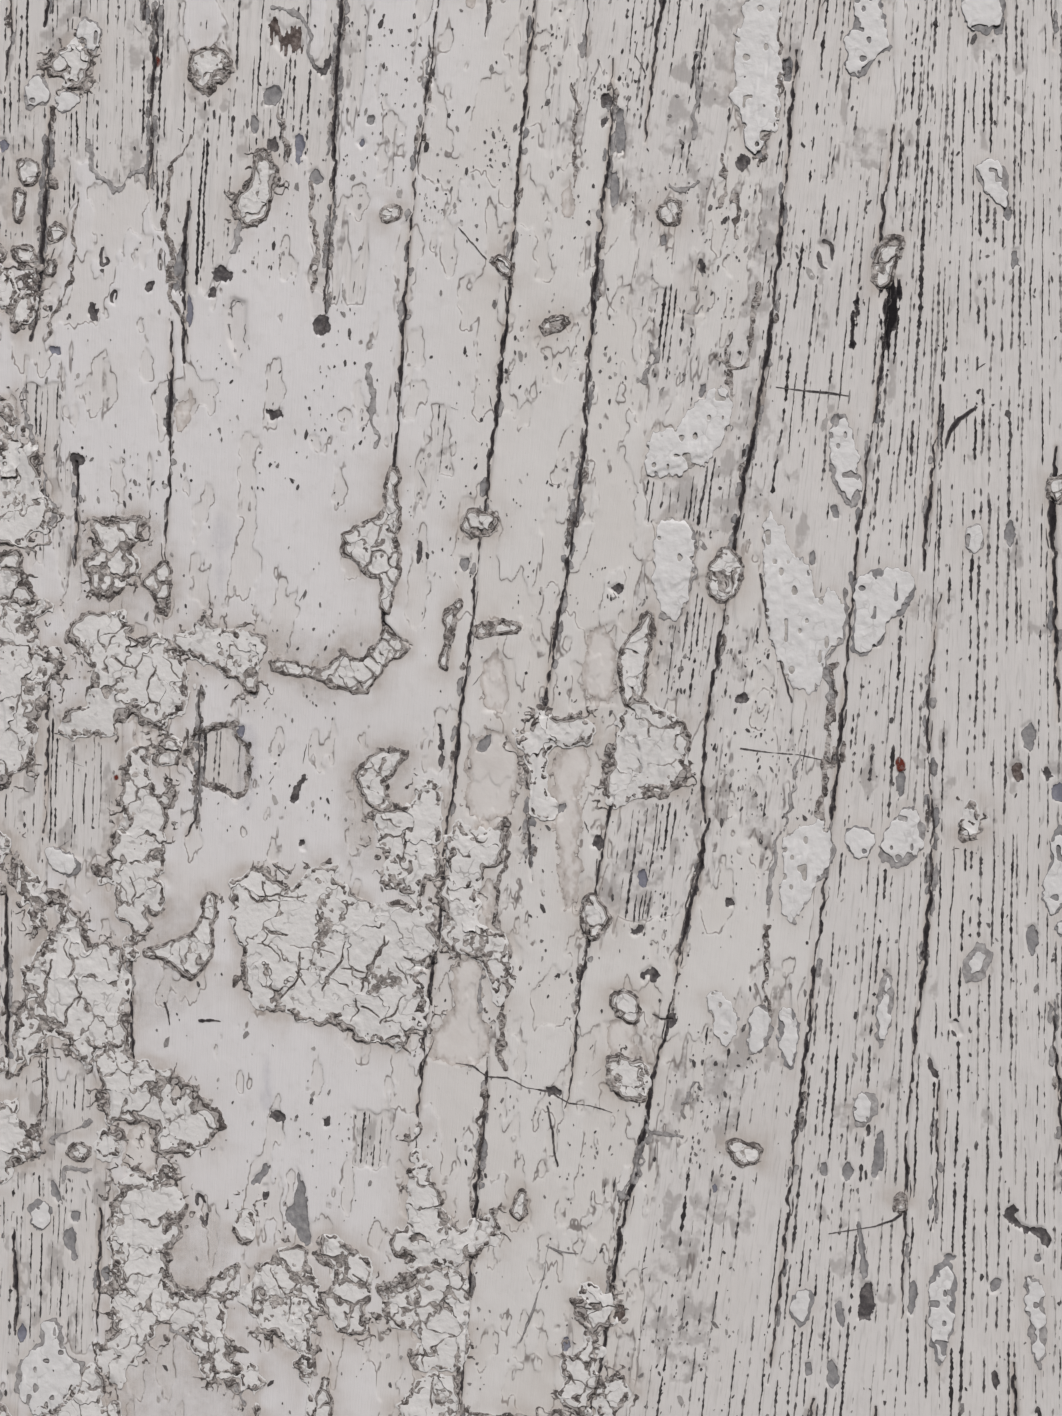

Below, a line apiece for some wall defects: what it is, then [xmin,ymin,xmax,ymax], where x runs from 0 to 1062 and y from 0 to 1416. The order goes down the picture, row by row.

peeling [24,16,103,113]
peeling [729,0,793,172]
peeling [0,139,59,224]
peeling [0,221,67,333]
peeling [88,289,118,321]
peeling [99,246,110,267]
crack [1045,446,1062,722]
crack [415,0,895,1416]